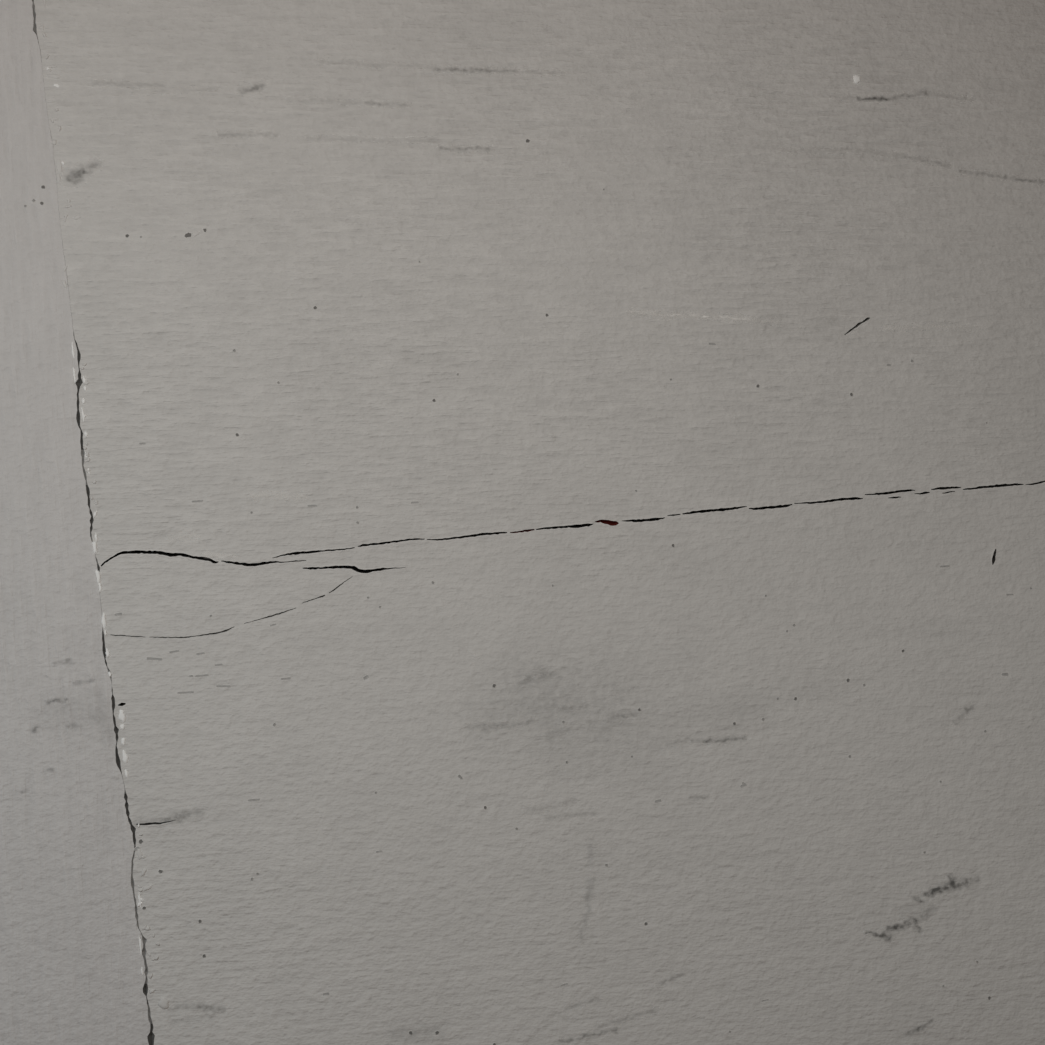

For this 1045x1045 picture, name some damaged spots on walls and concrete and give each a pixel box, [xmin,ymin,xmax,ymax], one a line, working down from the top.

crack [32,0,65,184]
crack [58,199,1045,1045]